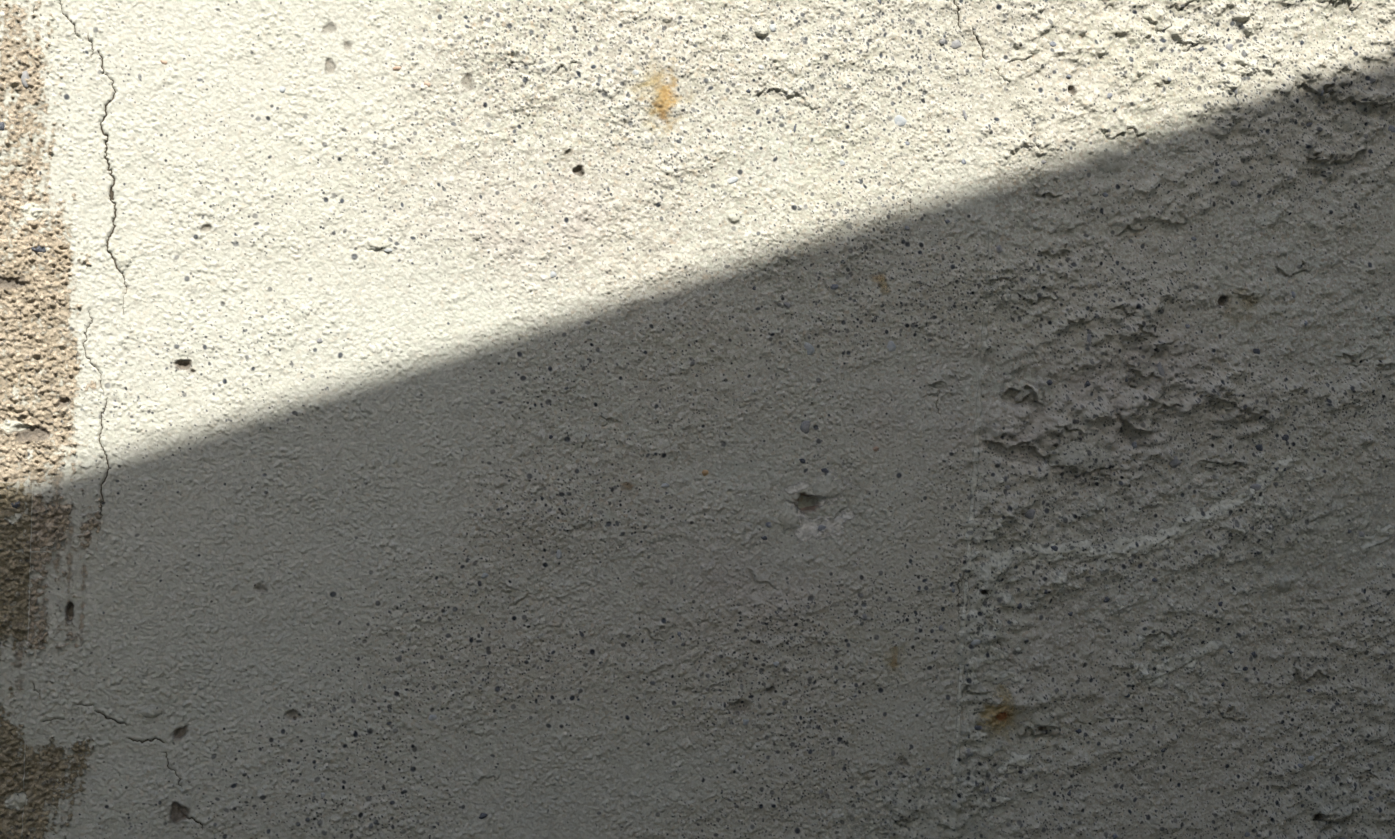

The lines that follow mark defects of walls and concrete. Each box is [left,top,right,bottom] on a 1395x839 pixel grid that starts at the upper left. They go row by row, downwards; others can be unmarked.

peeling [0,1,101,839]
crack [33,1,127,518]
rust [641,81,676,119]